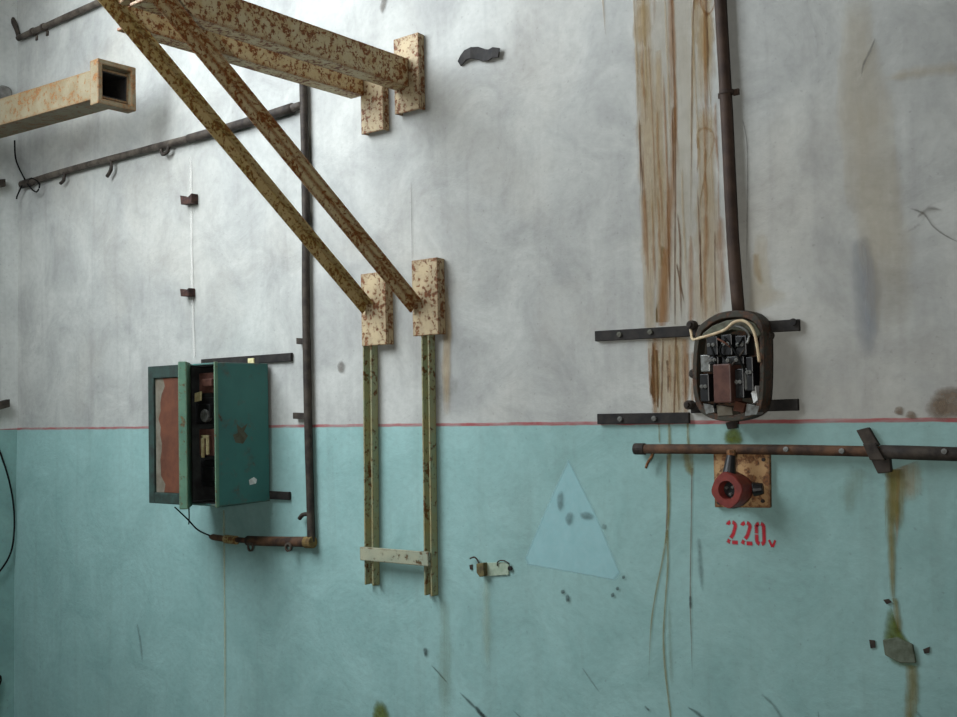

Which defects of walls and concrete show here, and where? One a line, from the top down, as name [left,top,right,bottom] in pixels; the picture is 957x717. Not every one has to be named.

rust [664,20,683,300]
rust [652,342,686,408]
water stain [930,390,957,417]